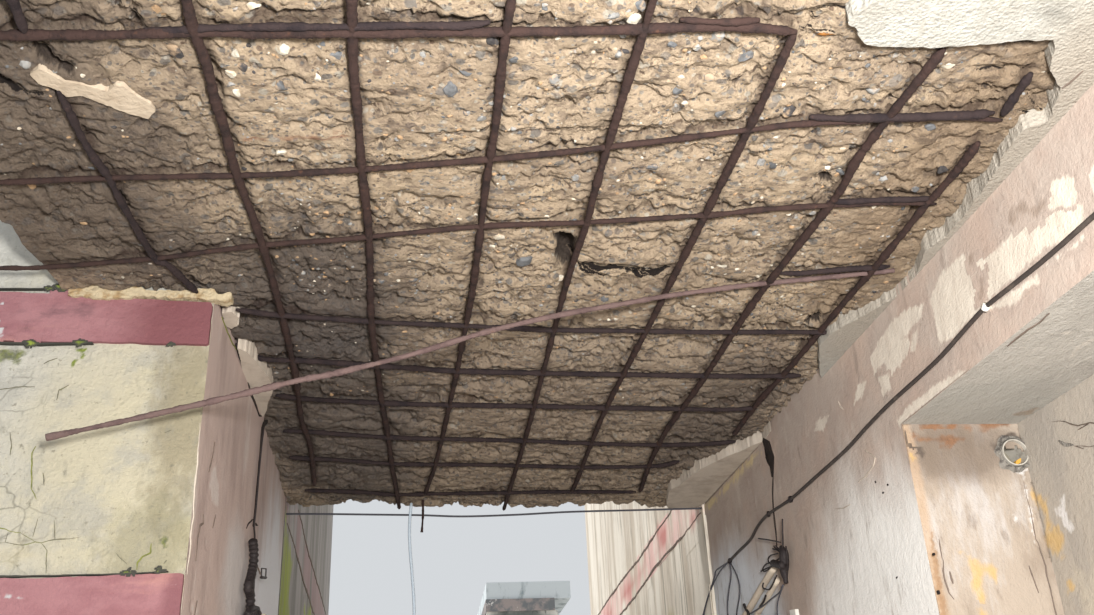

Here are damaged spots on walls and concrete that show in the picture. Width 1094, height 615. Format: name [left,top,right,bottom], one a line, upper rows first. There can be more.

corrosion [230,124,356,147]
spalling [45,40,1055,532]
crack [566,243,672,279]
peeling [852,153,1094,408]
crack [0,358,69,400]
corrosion [905,424,1018,454]
crack [1054,421,1094,449]
crack [0,434,79,570]
spalling [187,430,200,575]
crack [116,544,167,567]